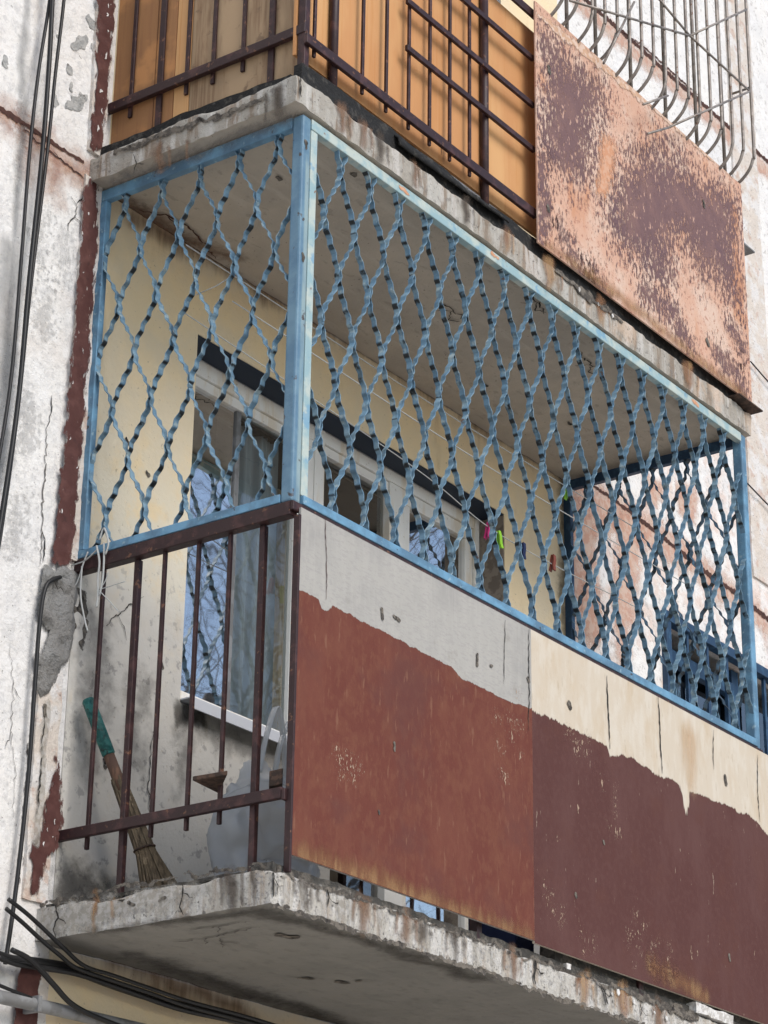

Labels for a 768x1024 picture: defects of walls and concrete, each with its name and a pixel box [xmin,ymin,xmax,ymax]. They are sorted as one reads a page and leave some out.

peeling [65,0,265,155]
rust [574,0,731,144]
rust [596,133,617,201]
rust [544,259,563,285]
rust [588,272,742,408]
crack [40,397,53,563]
crack [179,884,260,947]
rust [353,900,369,929]
peeling [30,701,700,1024]
rust [316,856,439,906]